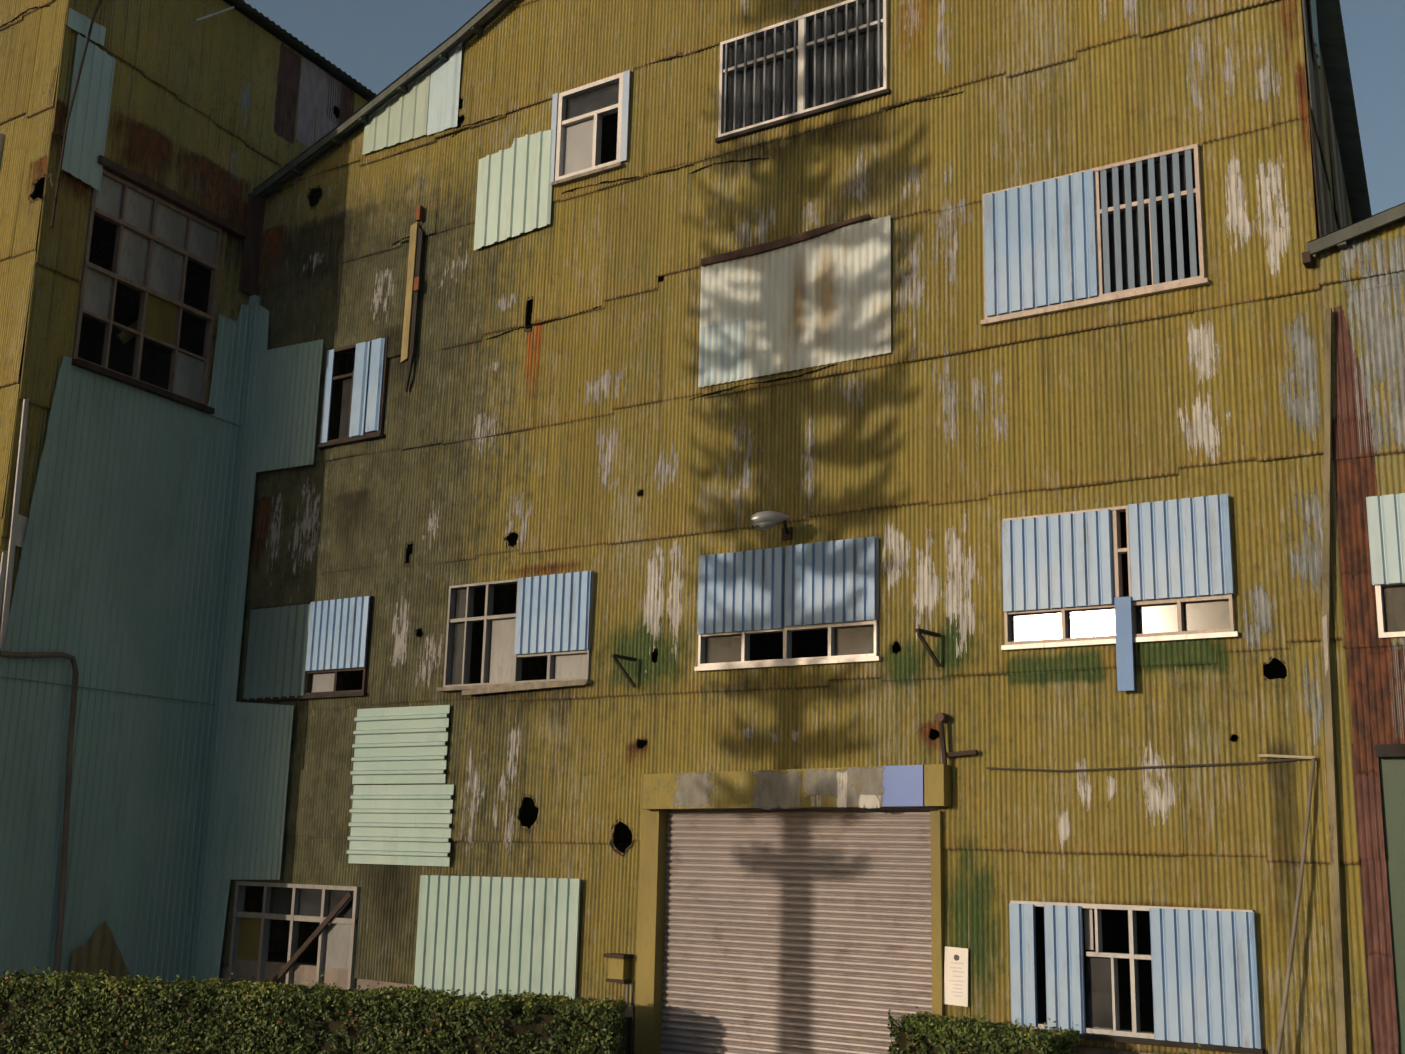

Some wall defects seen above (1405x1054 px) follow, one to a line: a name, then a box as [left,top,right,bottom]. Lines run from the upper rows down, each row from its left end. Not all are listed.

rust [1296,64,1310,147]
peeling [1225,140,1292,278]
peeling [1173,318,1231,464]
peeling [266,475,321,596]
peeling [641,523,684,660]
peeling [882,505,983,658]
rust [1332,306,1405,1054]
peeling [457,720,528,855]
peeling [1058,757,1117,851]
peeling [1137,740,1180,825]